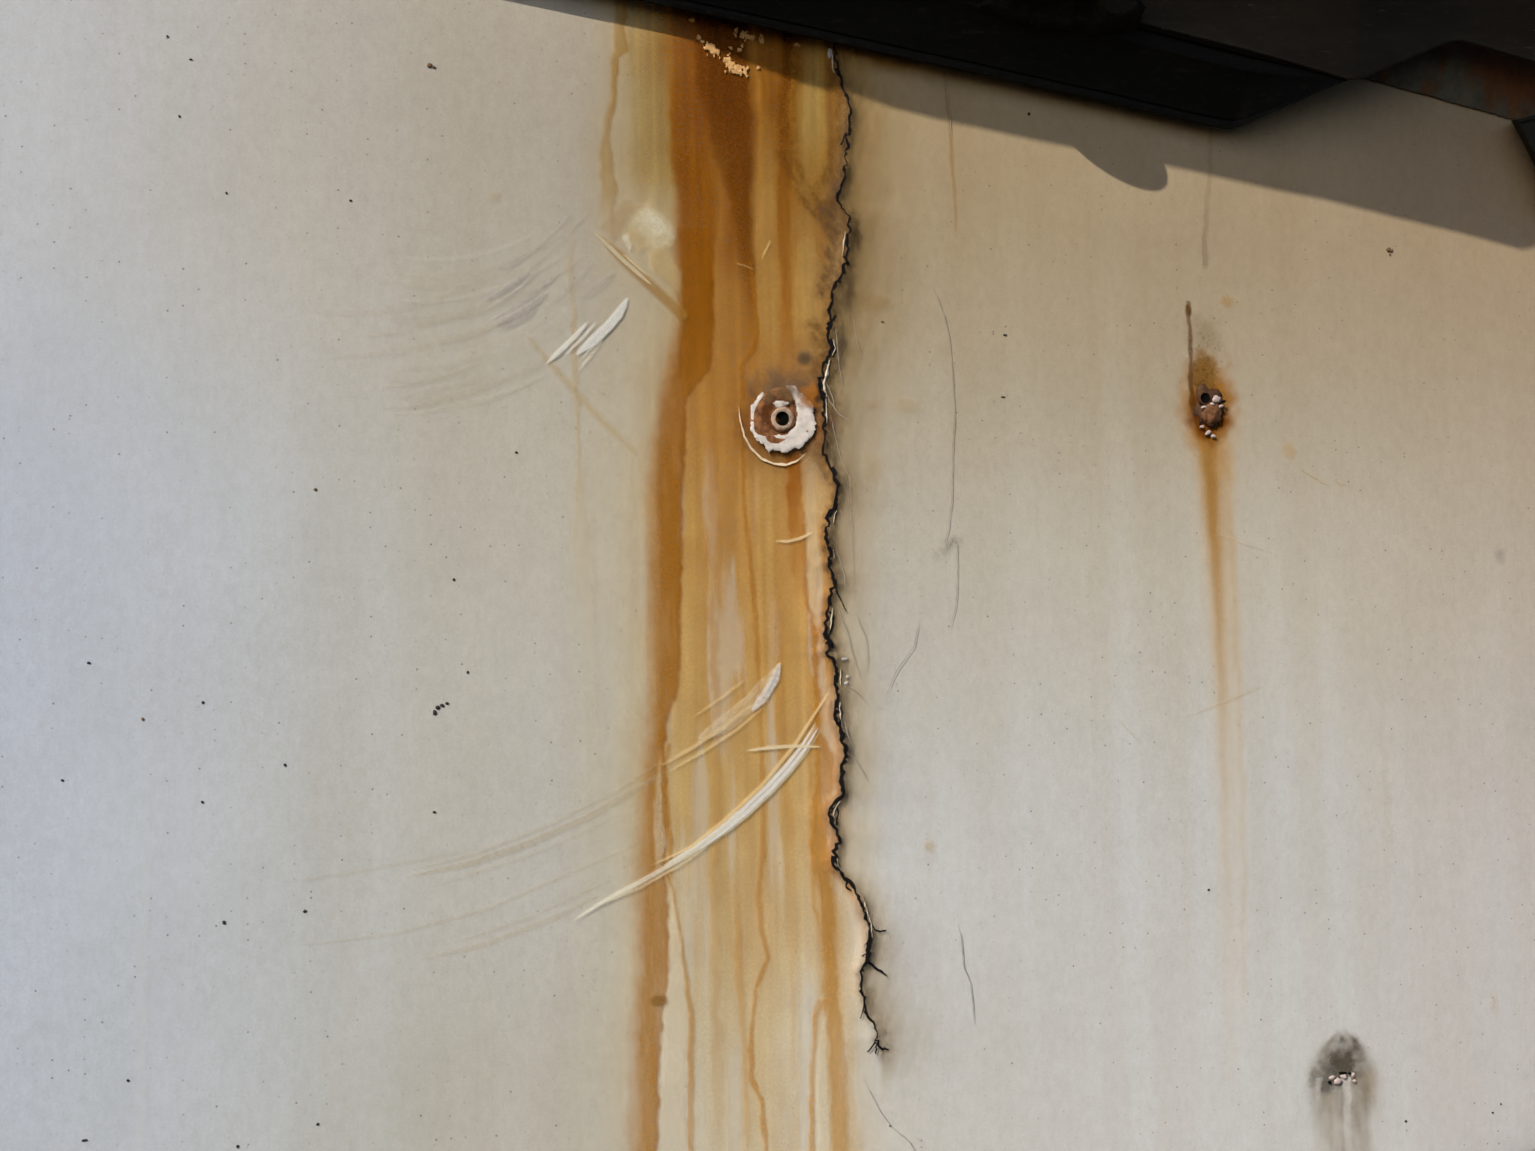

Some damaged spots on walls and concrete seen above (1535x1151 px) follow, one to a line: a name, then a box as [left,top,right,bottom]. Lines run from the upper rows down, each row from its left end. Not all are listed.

rust [611,0,855,1151]
crack [791,43,958,1150]
rust [1186,305,1233,613]